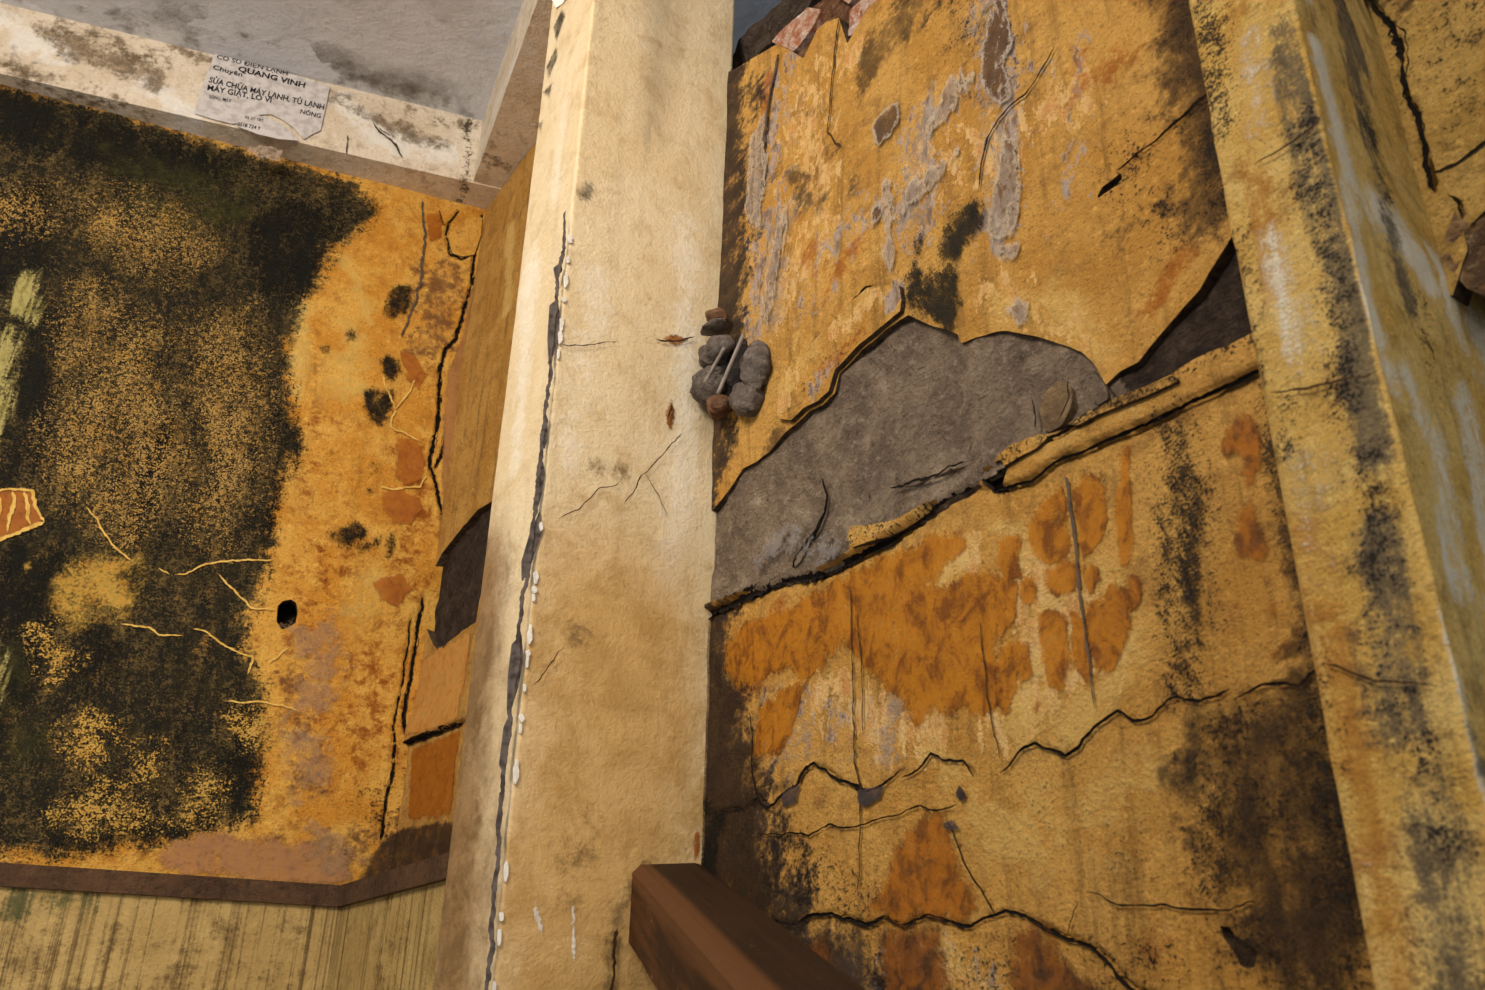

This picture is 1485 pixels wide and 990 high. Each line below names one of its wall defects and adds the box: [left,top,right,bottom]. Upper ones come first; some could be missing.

spalling [732,0,876,70]
peeling [926,0,1013,140]
leakage [0,84,474,884]
crack [380,598,462,840]
crack [401,201,483,519]
spalling [434,507,491,648]
spalling [484,211,573,990]
corrosion [723,447,1142,759]
spalling [710,135,1252,615]
crack [709,369,1435,990]
leakage [1143,376,1365,990]
spalling [1440,207,1485,299]